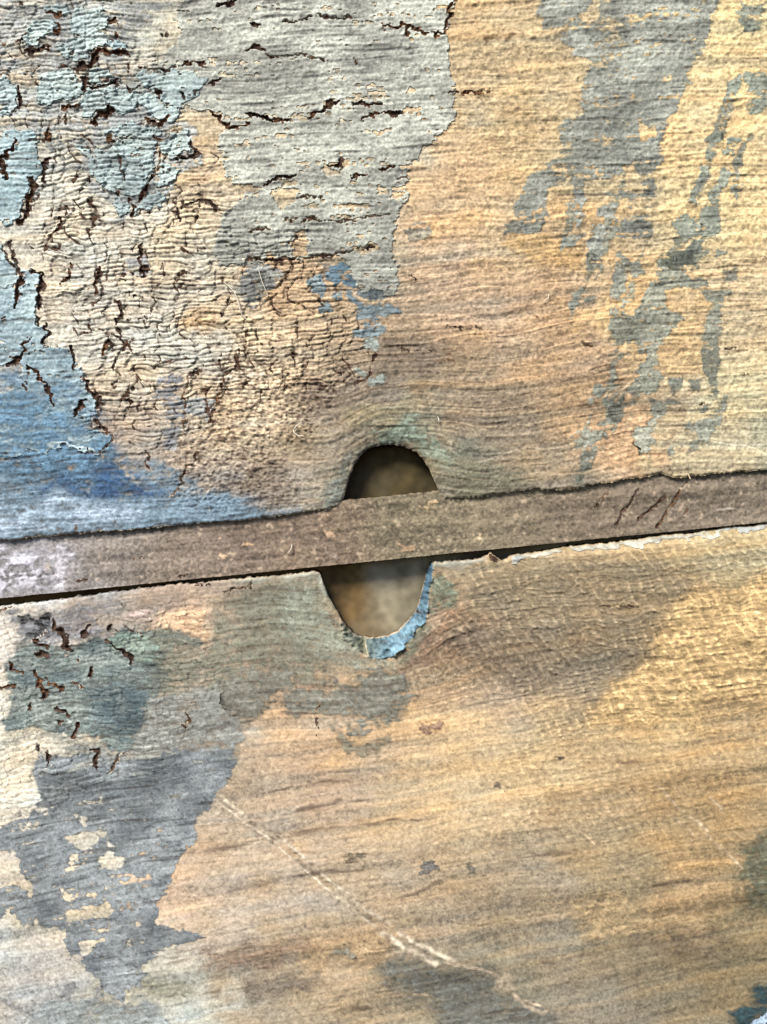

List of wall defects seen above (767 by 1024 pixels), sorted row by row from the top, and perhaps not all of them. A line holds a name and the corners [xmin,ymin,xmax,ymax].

peeling [0,244,179,597]
peeling [152,373,216,452]
crack [0,0,432,497]
peeling [0,0,457,351]
peeling [354,367,386,386]
crack [381,0,457,39]
crack [448,88,490,96]
peeling [503,0,767,484]
crack [0,602,143,774]
peeling [0,615,237,1002]